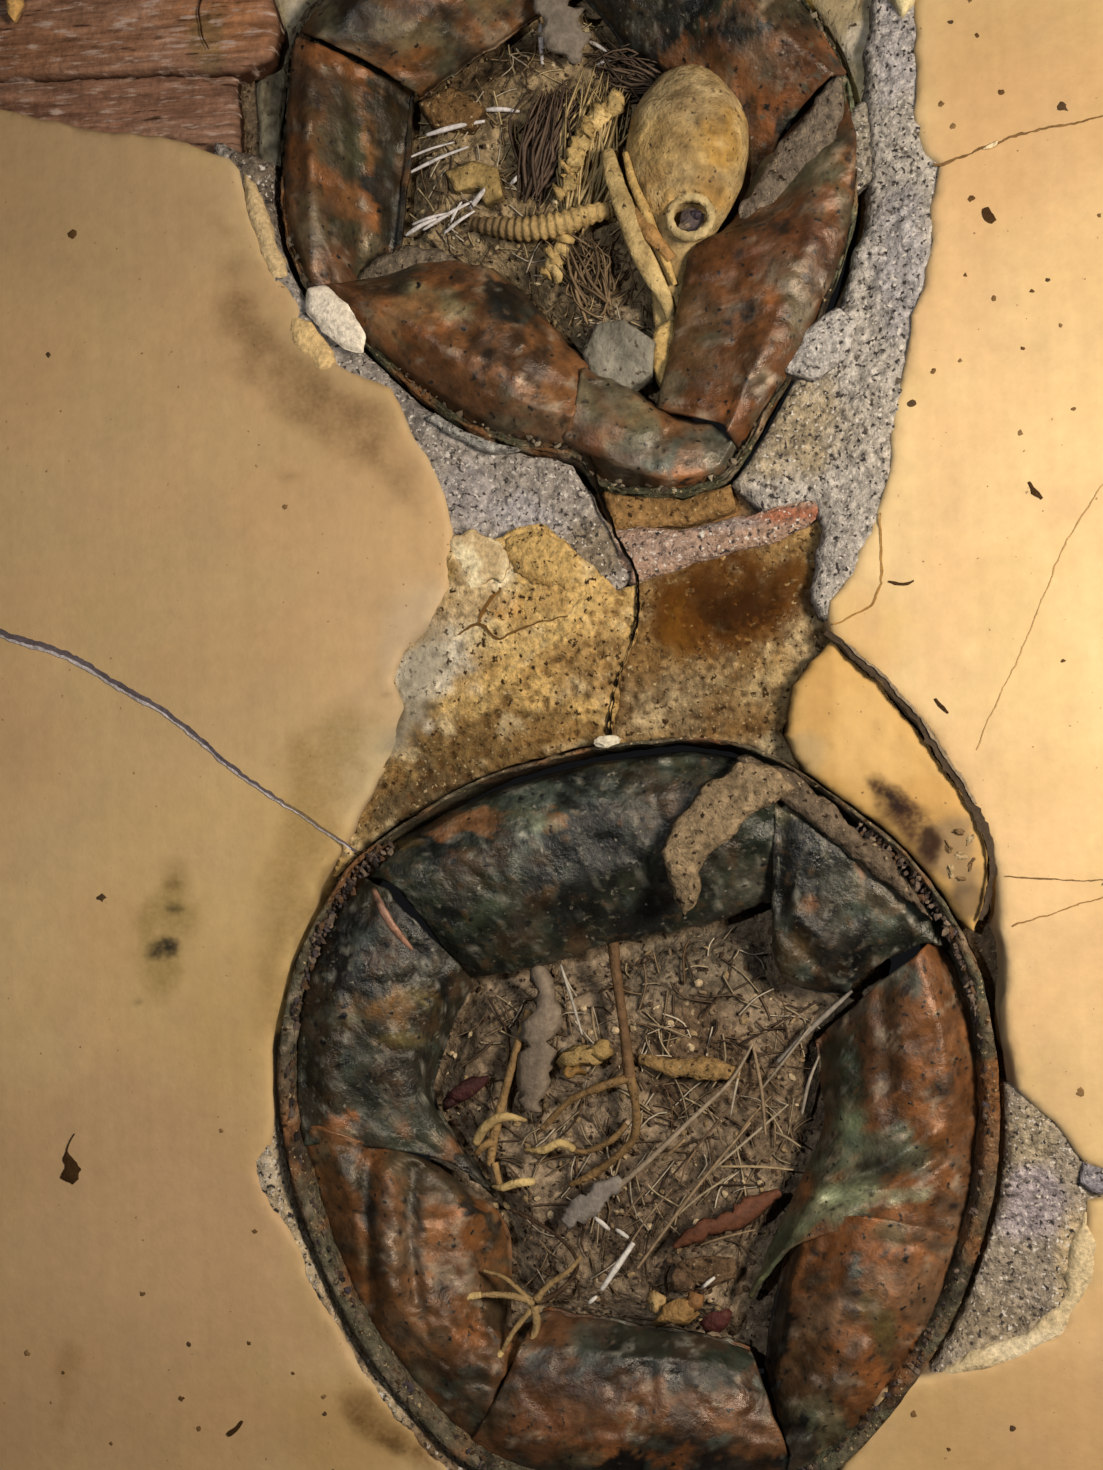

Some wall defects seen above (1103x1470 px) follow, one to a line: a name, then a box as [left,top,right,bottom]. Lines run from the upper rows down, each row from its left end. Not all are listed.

crack [933,115,1103,166]
crack [0,629,357,852]
crack [824,484,1103,927]